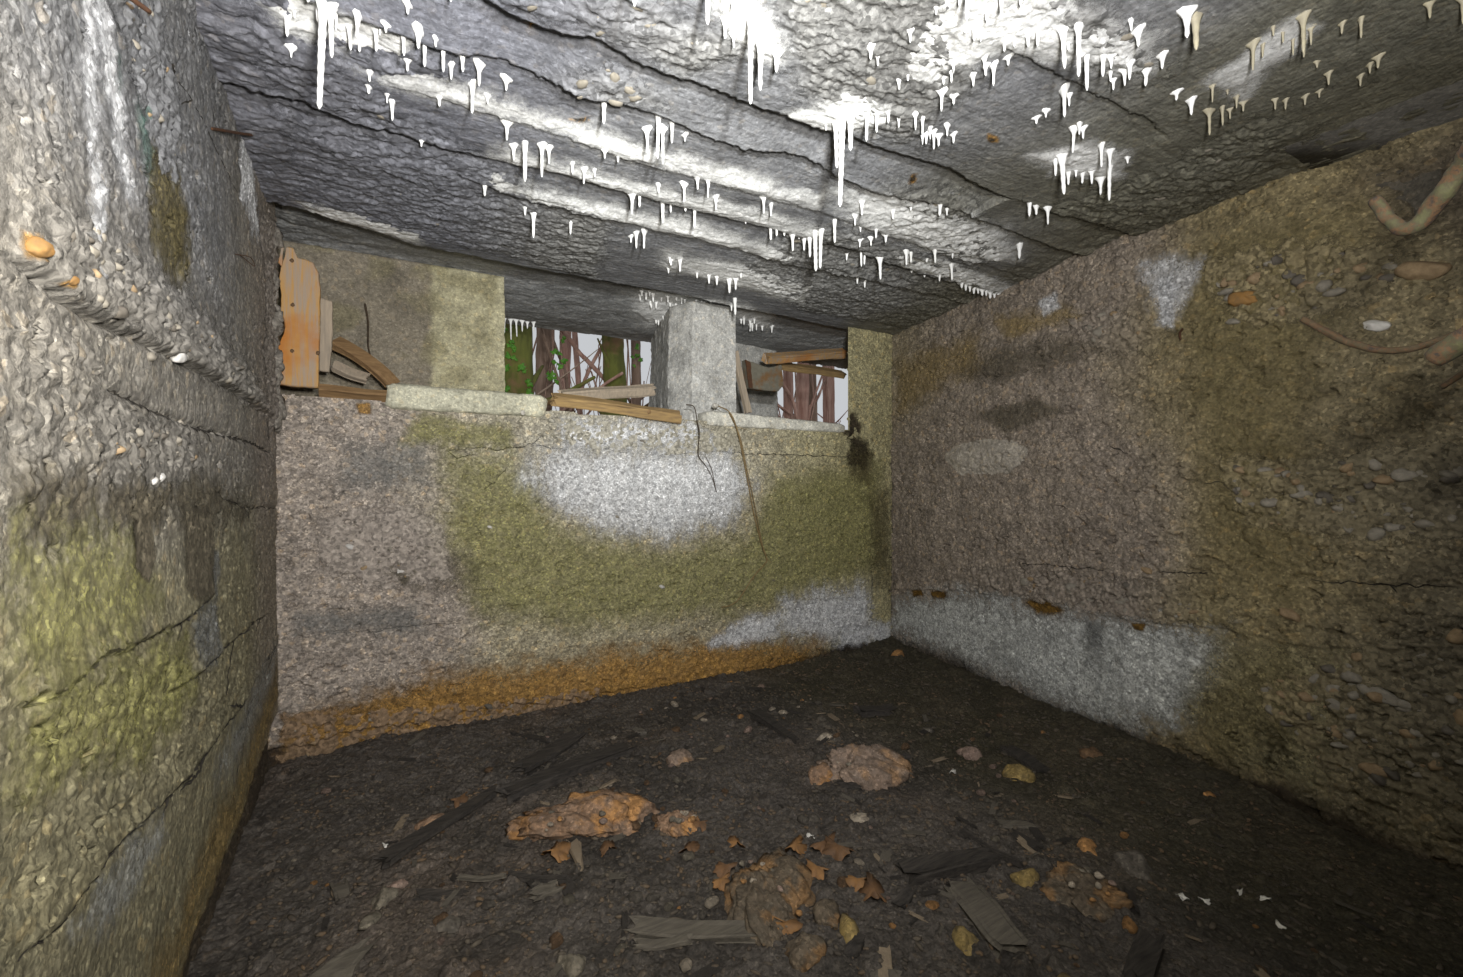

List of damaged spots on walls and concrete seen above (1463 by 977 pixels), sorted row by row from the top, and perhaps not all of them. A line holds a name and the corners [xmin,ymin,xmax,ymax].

leakage [904,0,1153,84]
leakage [1206,16,1318,100]
crack [171,63,241,201]
leakage [238,136,260,234]
leakage [269,0,1018,328]
leakage [1027,140,1125,180]
leakage [1144,259,1198,325]
leakage [521,419,748,540]
leakage [844,413,870,470]
leakage [15,465,246,776]
leakage [708,586,1341,826]
crack [17,599,276,961]